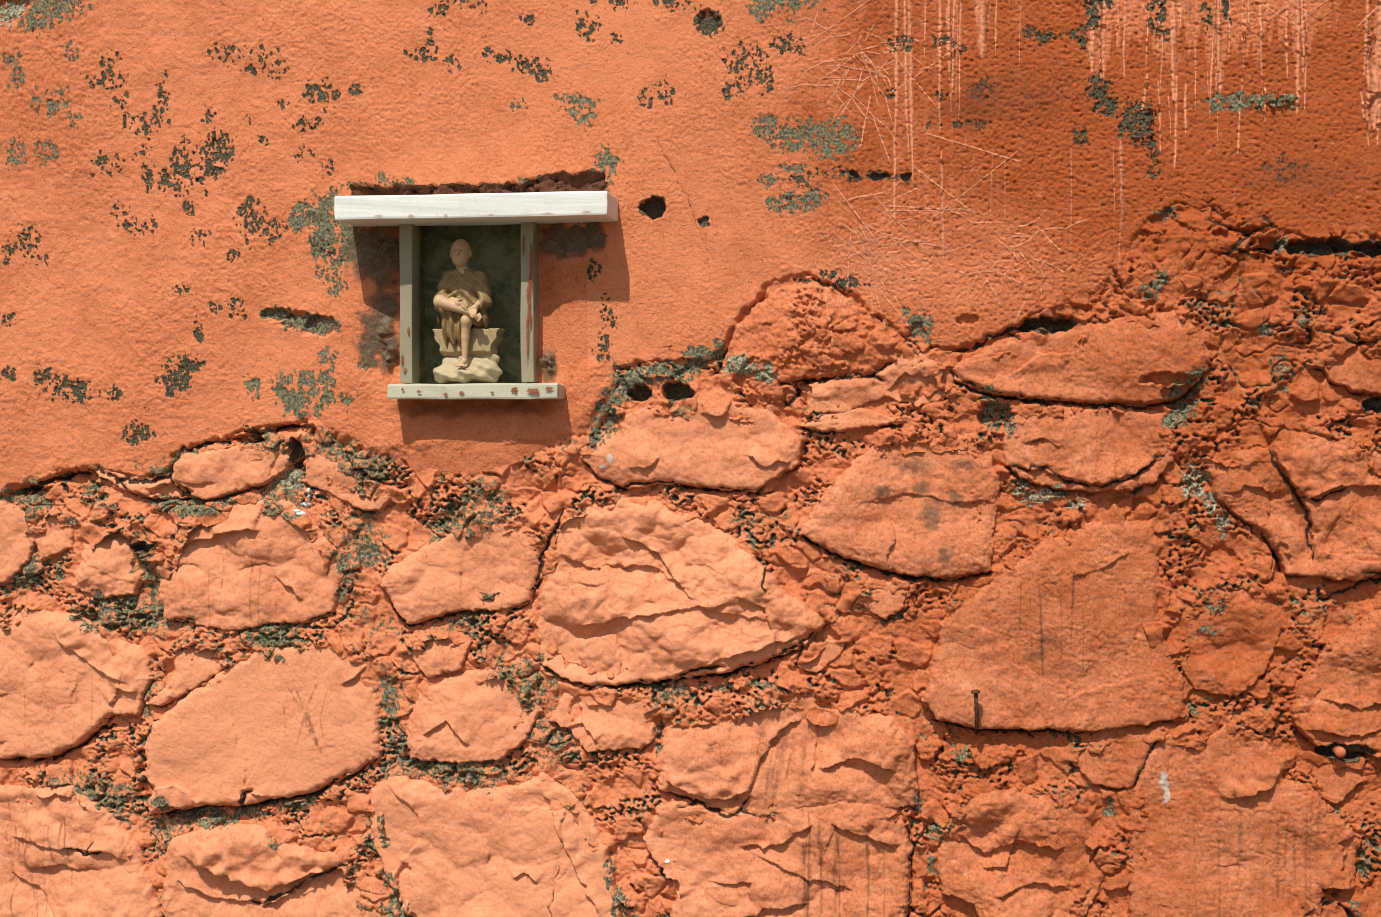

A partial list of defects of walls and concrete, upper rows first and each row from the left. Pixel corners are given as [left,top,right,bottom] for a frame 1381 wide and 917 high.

peeling [576,0,635,44]
spalling [653,0,725,37]
peeling [721,0,899,215]
leakage [1088,0,1328,169]
peeling [33,363,123,404]
peeling [154,297,354,420]
leakage [345,215,400,366]
spalling [226,77,624,298]
leakage [537,352,556,380]
leakage [540,211,606,258]
peeling [555,222,778,450]
peeling [150,796,317,830]